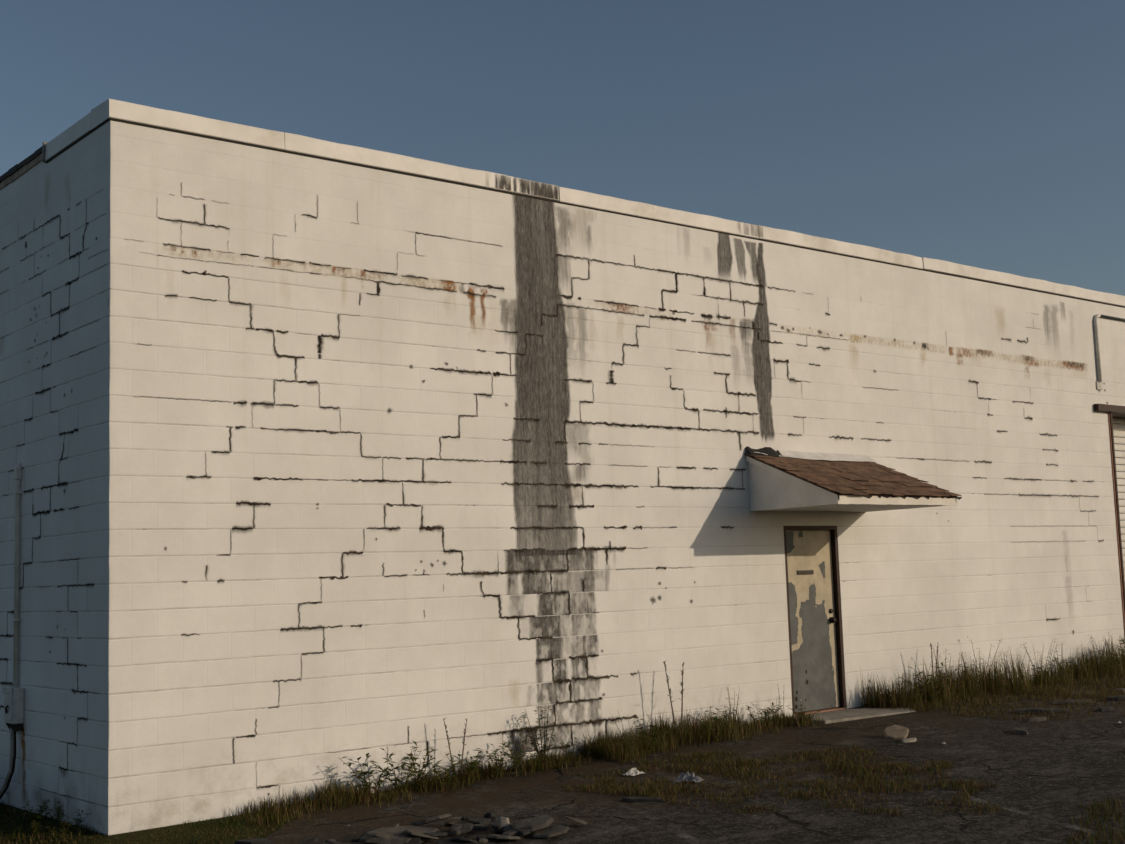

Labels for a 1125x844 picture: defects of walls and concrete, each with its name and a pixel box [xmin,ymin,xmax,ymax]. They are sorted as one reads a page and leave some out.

corrosion [443,281,487,320]
leakage [718,233,774,439]
crack [0,203,98,797]
crack [141,183,844,763]
leakage [496,175,601,760]
peeling [786,531,803,553]
crack [830,422,891,441]
crack [917,380,1098,512]
peeling [788,561,836,712]